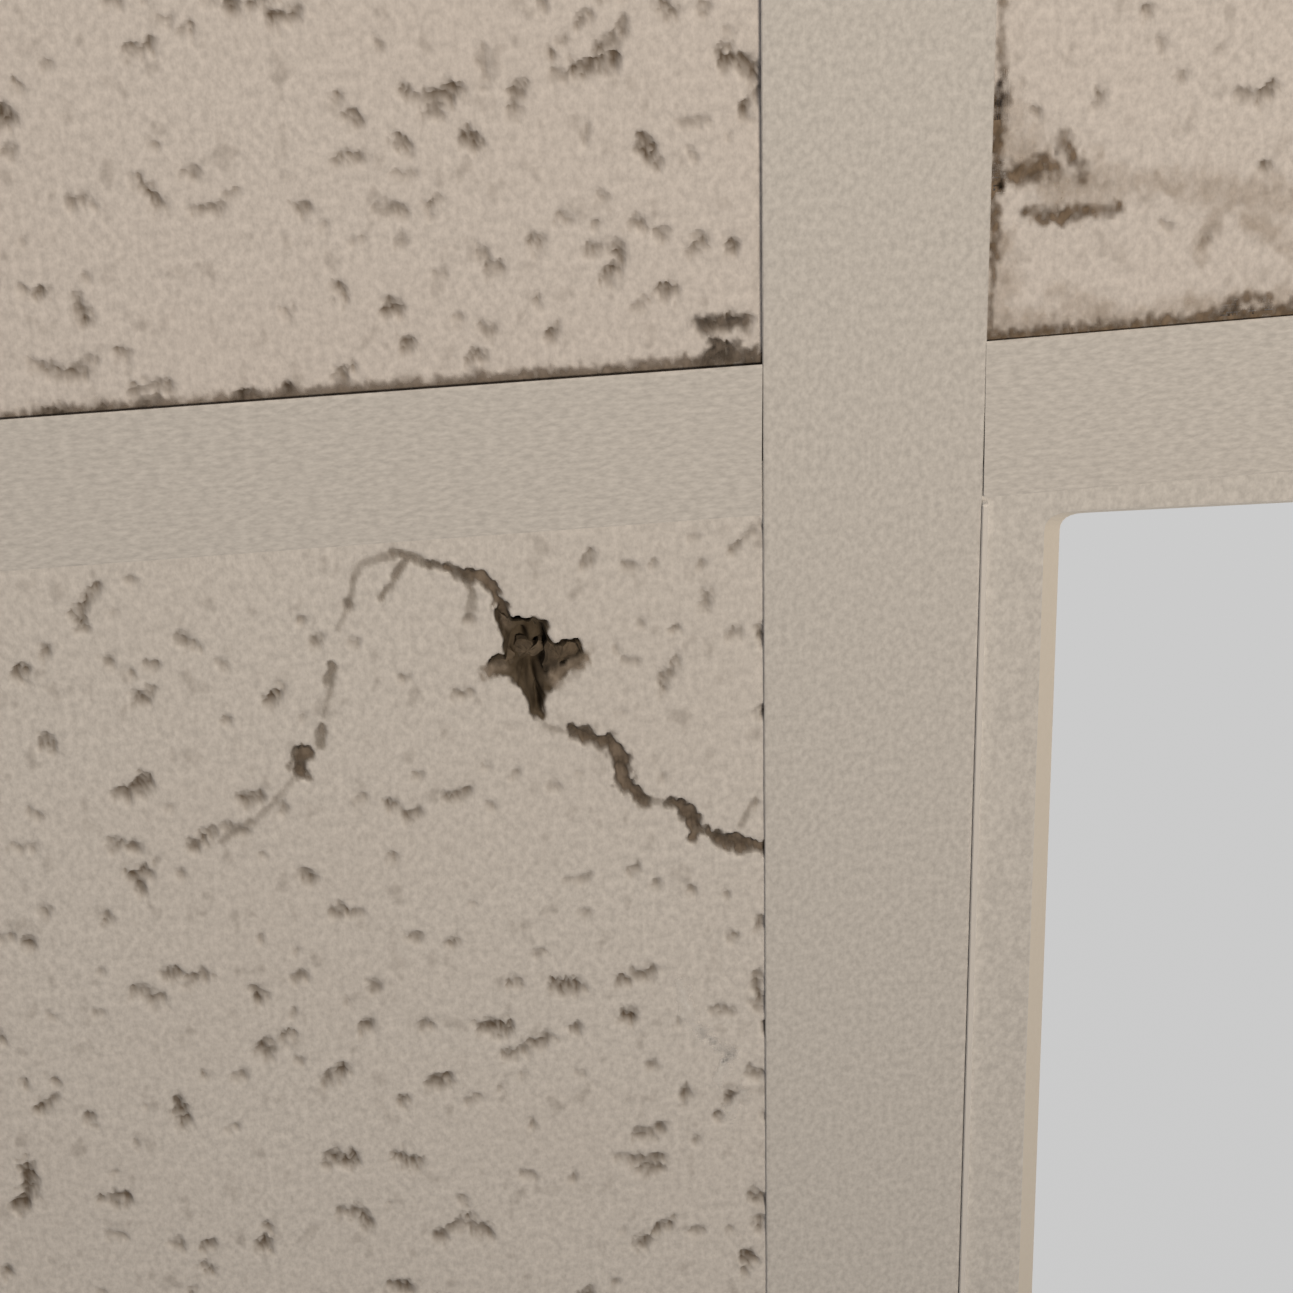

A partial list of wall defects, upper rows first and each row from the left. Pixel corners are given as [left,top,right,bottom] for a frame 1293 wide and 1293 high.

crack [381,552,512,628]
crack [328,662,336,676]
crack [293,724,325,779]
crack [567,724,765,854]